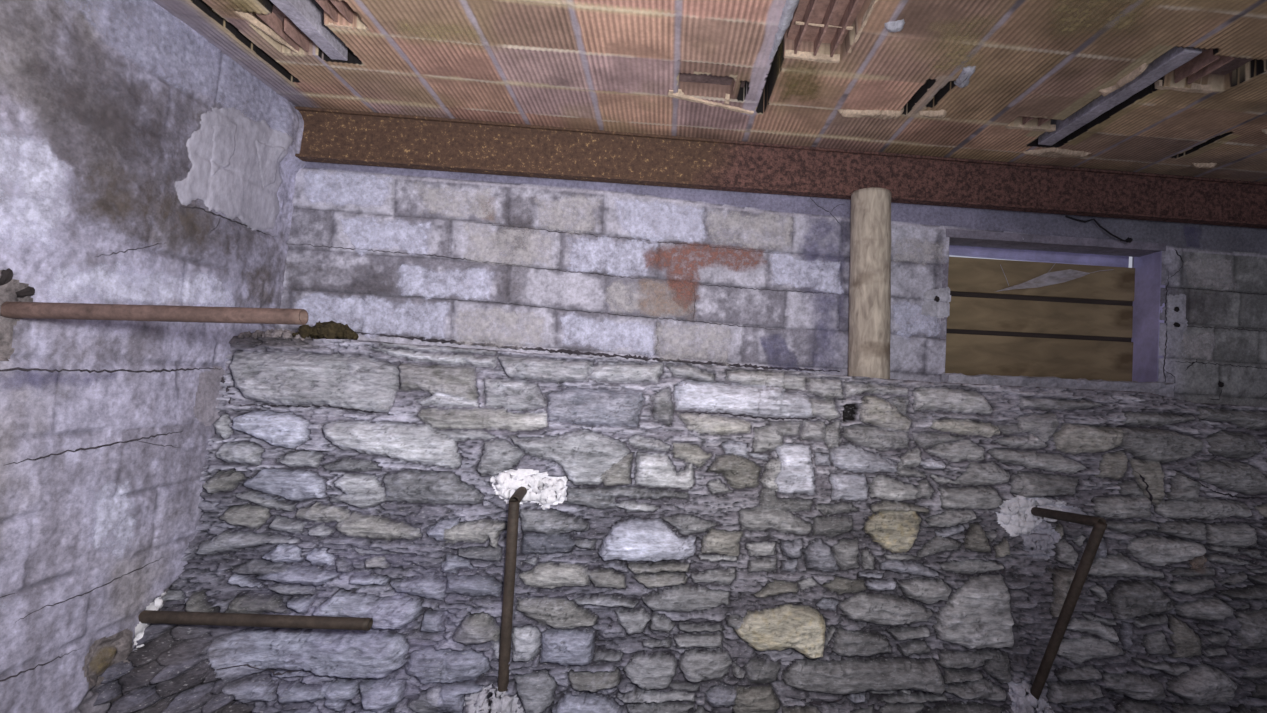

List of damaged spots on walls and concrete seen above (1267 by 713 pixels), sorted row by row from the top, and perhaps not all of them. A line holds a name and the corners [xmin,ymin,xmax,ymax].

flaking render [81,0,294,231]
corrosion [641,243,763,313]
crack [0,367,387,413]
crack [6,431,182,465]
crack [0,557,163,622]
crack [0,649,79,682]